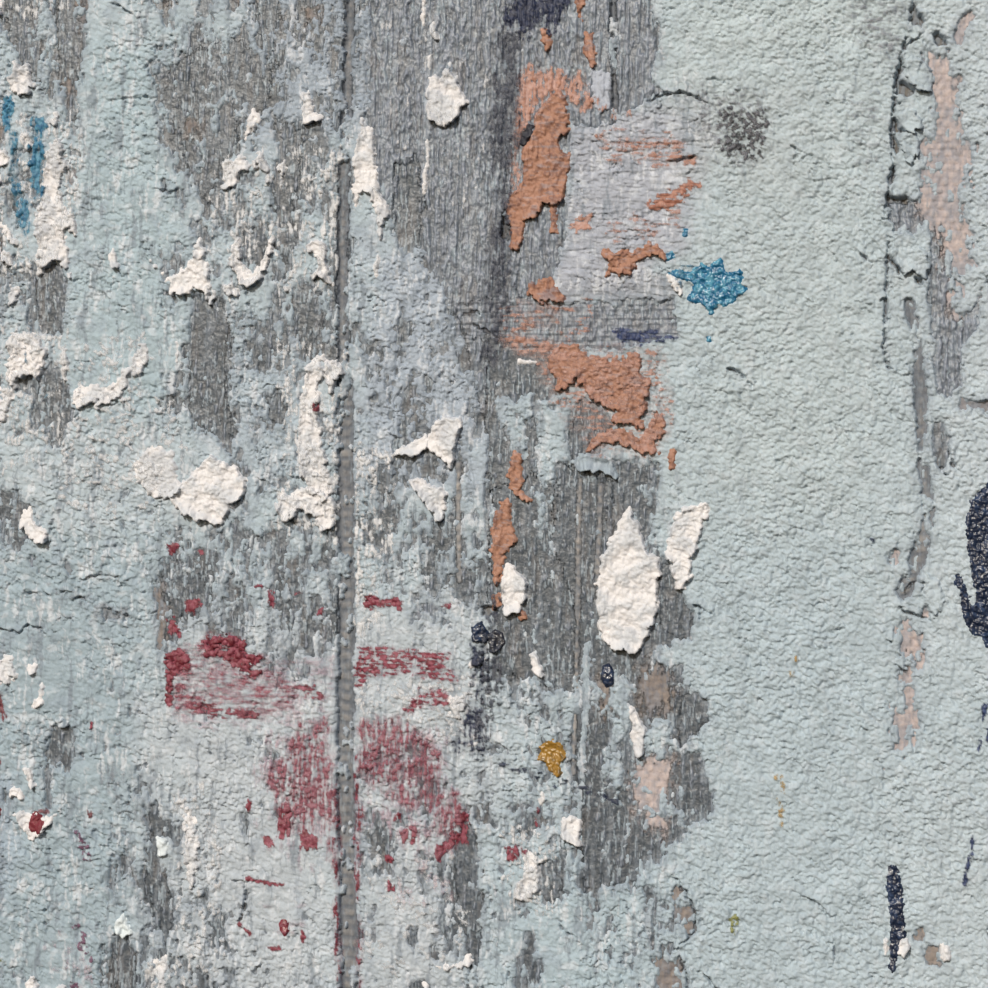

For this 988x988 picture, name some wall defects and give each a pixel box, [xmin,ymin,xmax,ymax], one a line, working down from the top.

peeling [0,0,89,136]
peeling [587,17,618,114]
crack [648,91,702,102]
spalling [910,3,924,28]
peeling [887,11,979,321]
peeling [16,361,75,448]
peeling [147,0,365,687]
peeling [932,422,951,469]
peeling [0,490,40,573]
peeling [319,307,715,988]
peeling [888,619,926,751]
peeling [99,791,250,988]